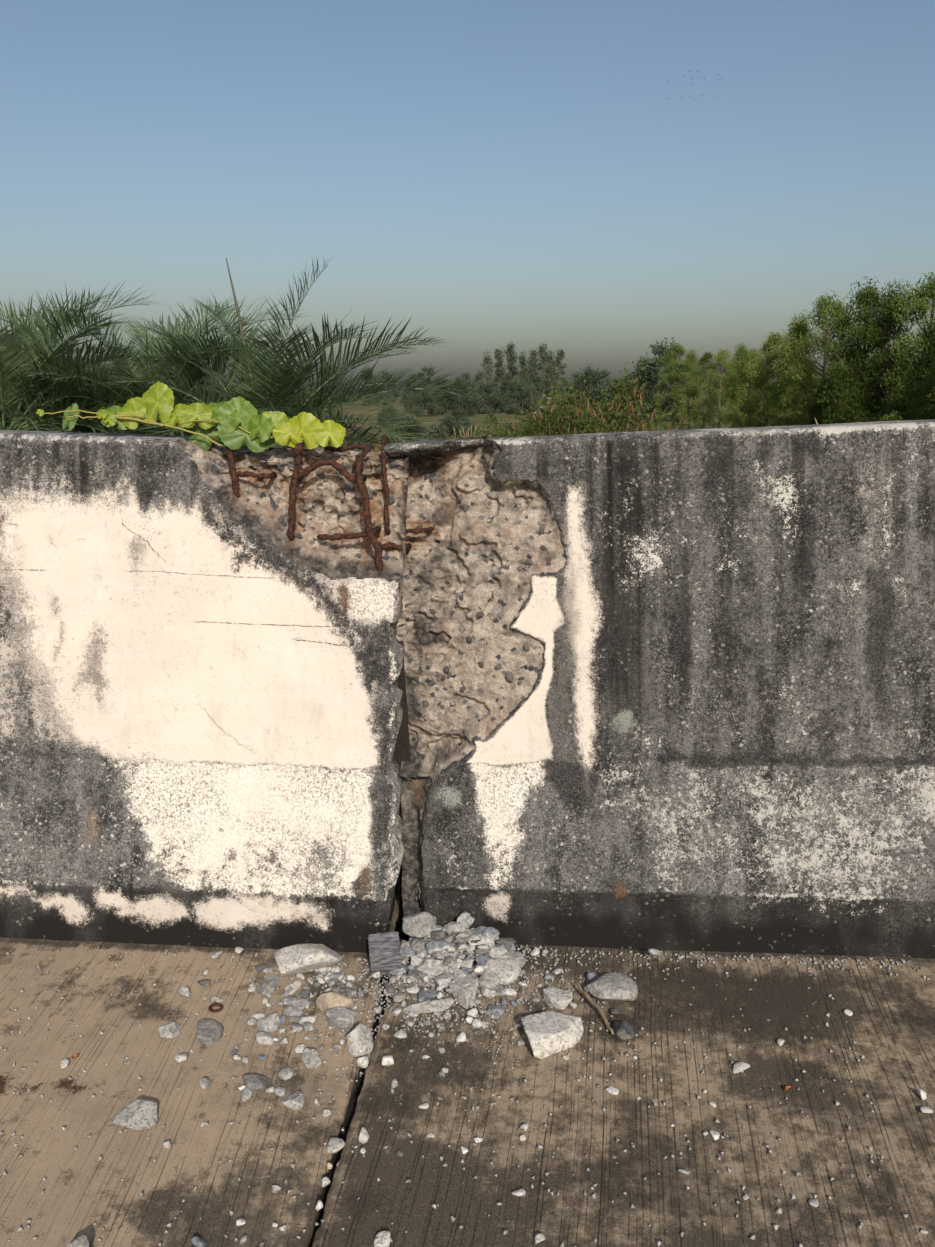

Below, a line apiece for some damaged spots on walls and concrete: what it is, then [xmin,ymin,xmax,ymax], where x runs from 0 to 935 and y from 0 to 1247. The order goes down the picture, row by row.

rust [225,434,435,571]
water stain [73,625,106,702]
water stain [195,481,399,693]
peeling [0,435,604,930]
water stain [367,707,397,913]
water stain [543,759,598,809]
water stain [654,666,935,770]
water stain [863,568,897,729]
crack [308,641,430,1247]